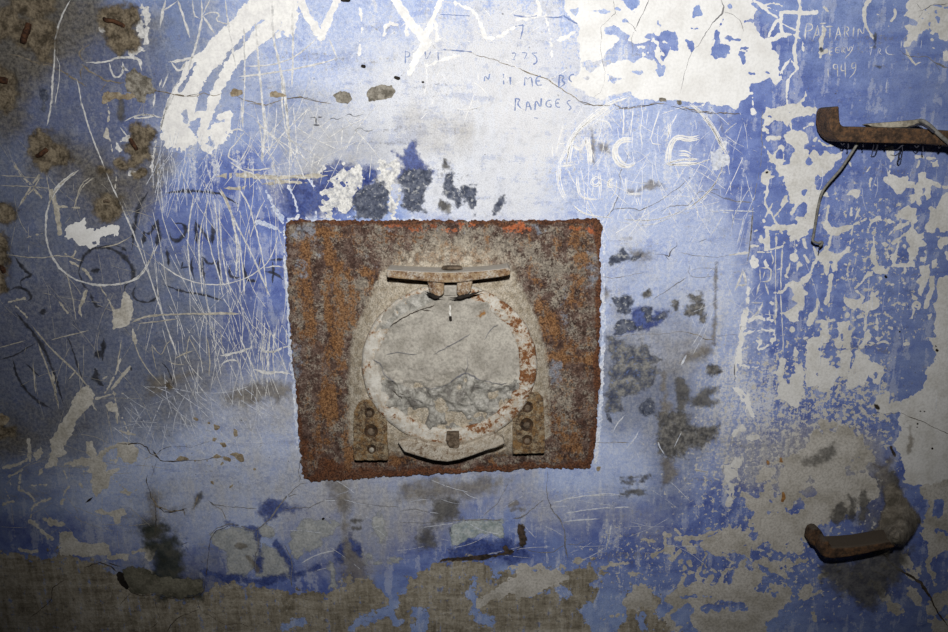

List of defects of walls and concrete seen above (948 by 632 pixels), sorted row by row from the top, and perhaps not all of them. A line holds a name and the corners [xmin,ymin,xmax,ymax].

spalling [0,0,58,64]
spalling [97,3,151,56]
spalling [0,64,157,344]
crack [450,0,763,300]
water stain [608,248,641,265]
water stain [604,289,722,458]
peeling [453,0,948,632]
water stain [142,513,184,579]
crack [87,441,333,631]
peeling [0,358,880,632]
water stain [830,491,869,524]